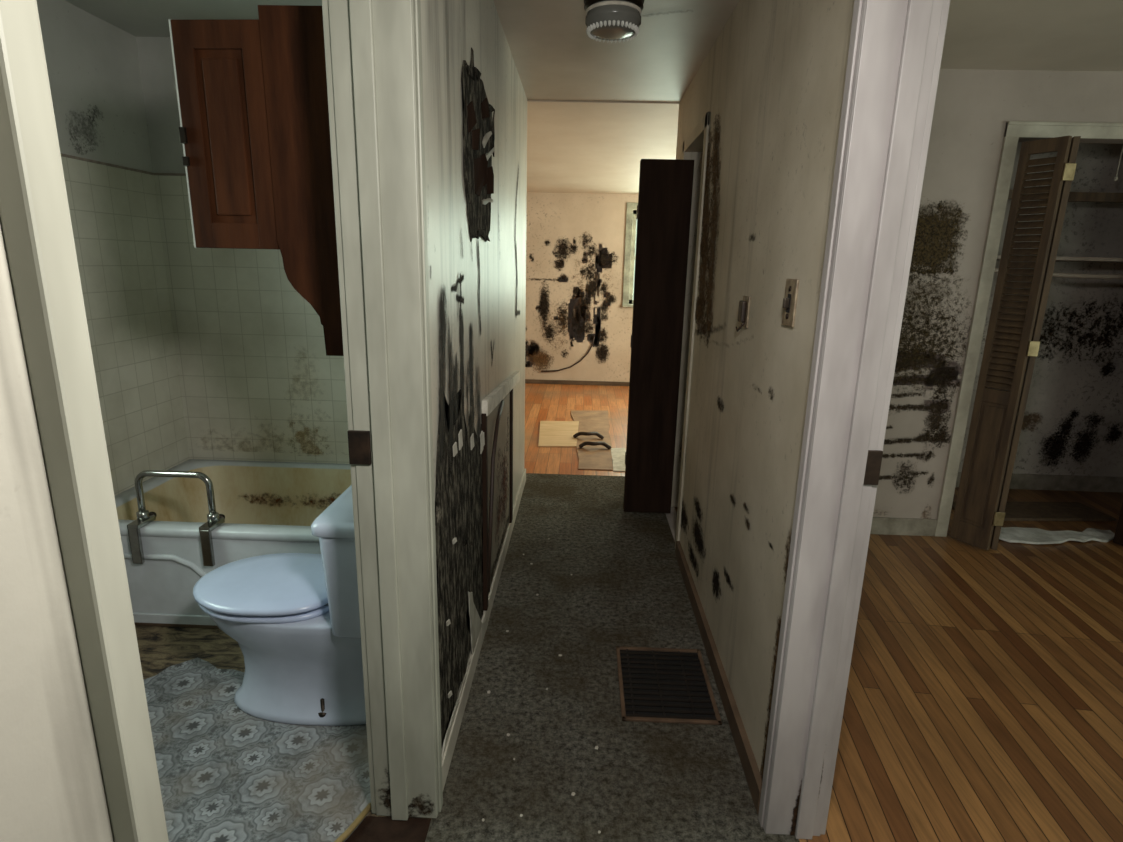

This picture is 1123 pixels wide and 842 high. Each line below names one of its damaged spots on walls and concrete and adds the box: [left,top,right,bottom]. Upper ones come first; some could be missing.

damp [525,232,617,370]
damp [879,201,972,493]
damp [1039,298,1123,378]
damp [1021,410,1123,466]